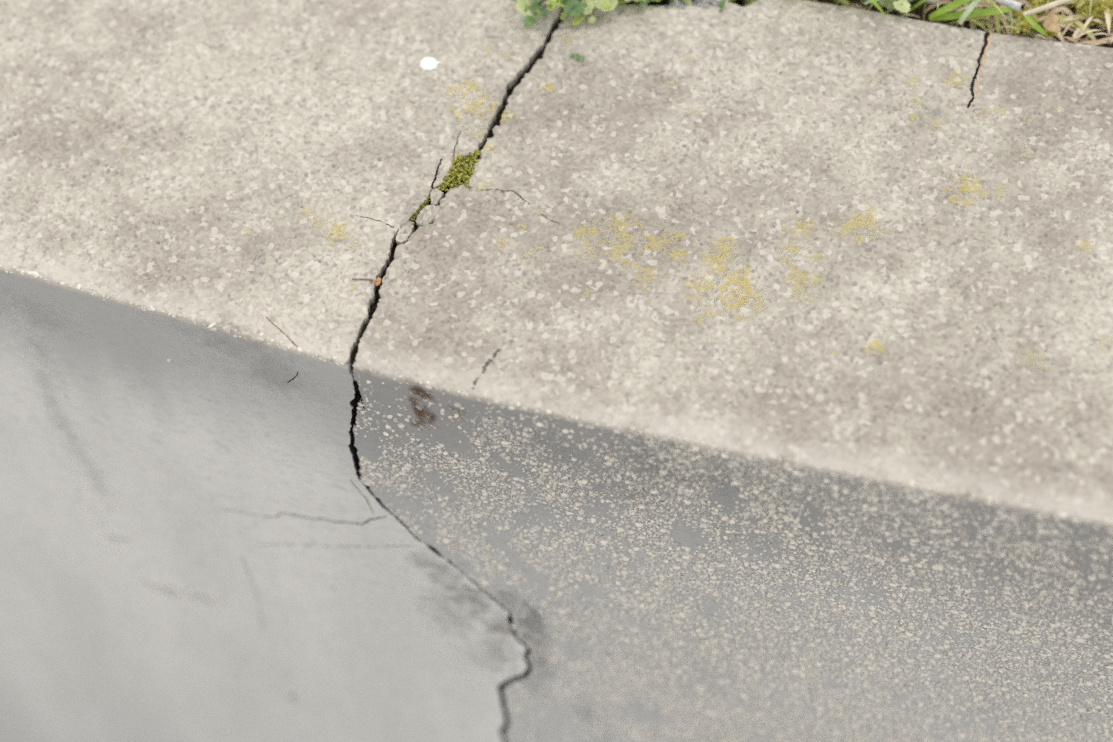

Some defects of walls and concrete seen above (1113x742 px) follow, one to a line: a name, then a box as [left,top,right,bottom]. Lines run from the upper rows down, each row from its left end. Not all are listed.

crack [967,32,993,108]
crack [223,7,568,548]
crack [501,682,509,742]